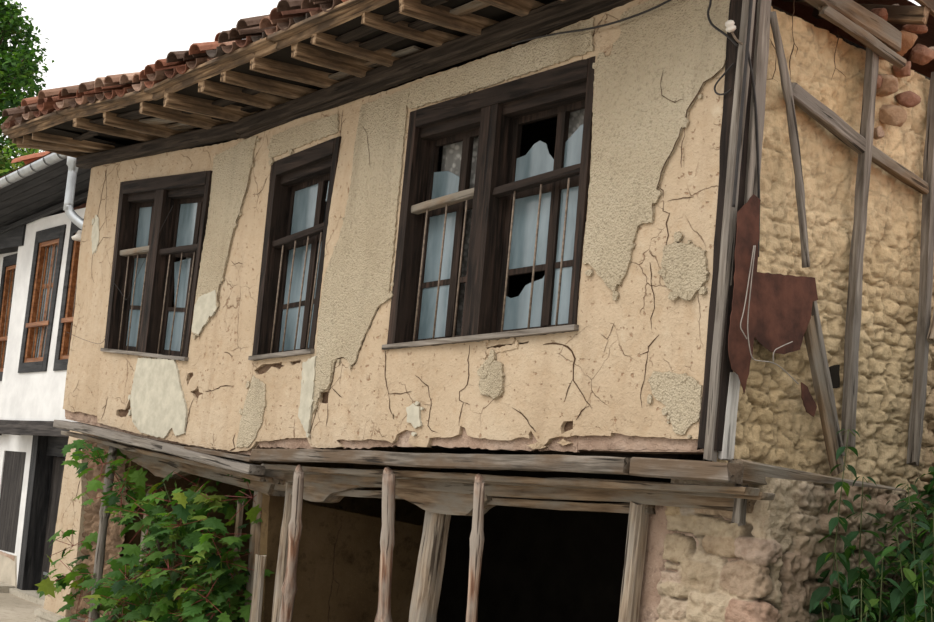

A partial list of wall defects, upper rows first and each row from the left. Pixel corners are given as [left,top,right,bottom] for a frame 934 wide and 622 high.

peeling [191,114,340,339]
peeling [236,0,730,452]
crack [640,61,727,405]
peeling [119,357,203,438]
crack [543,342,592,420]